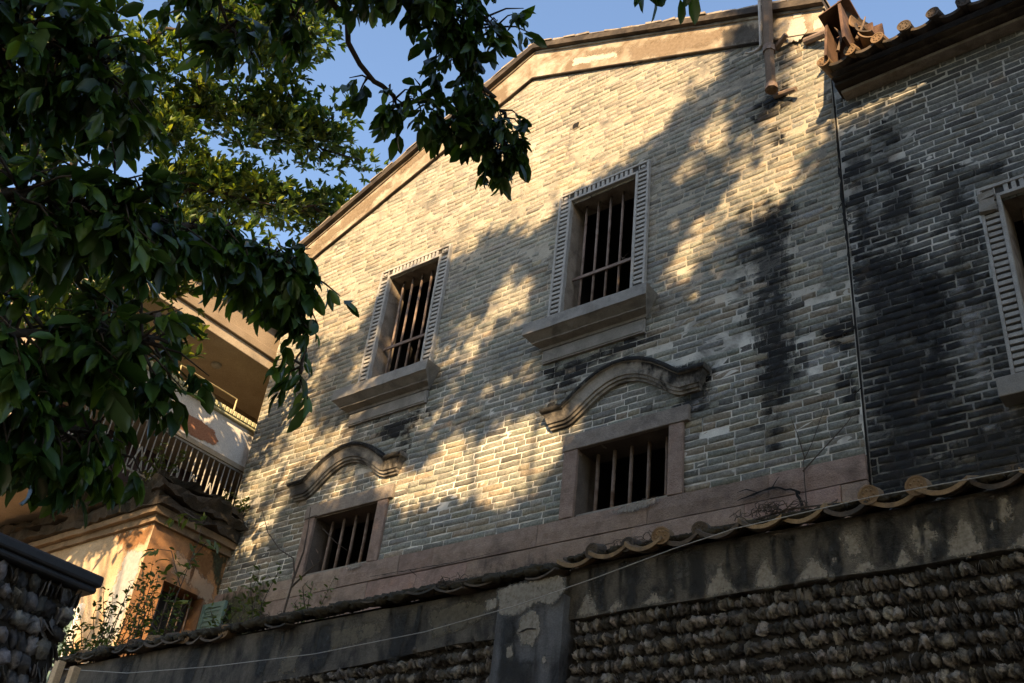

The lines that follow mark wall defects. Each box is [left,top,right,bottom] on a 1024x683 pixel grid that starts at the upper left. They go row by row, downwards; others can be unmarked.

leakage [737,120,1024,495]
peeling [180,415,219,445]
leakage [916,498,950,562]
leakage [968,489,1004,550]
leakage [656,549,706,600]
peeling [430,576,566,658]